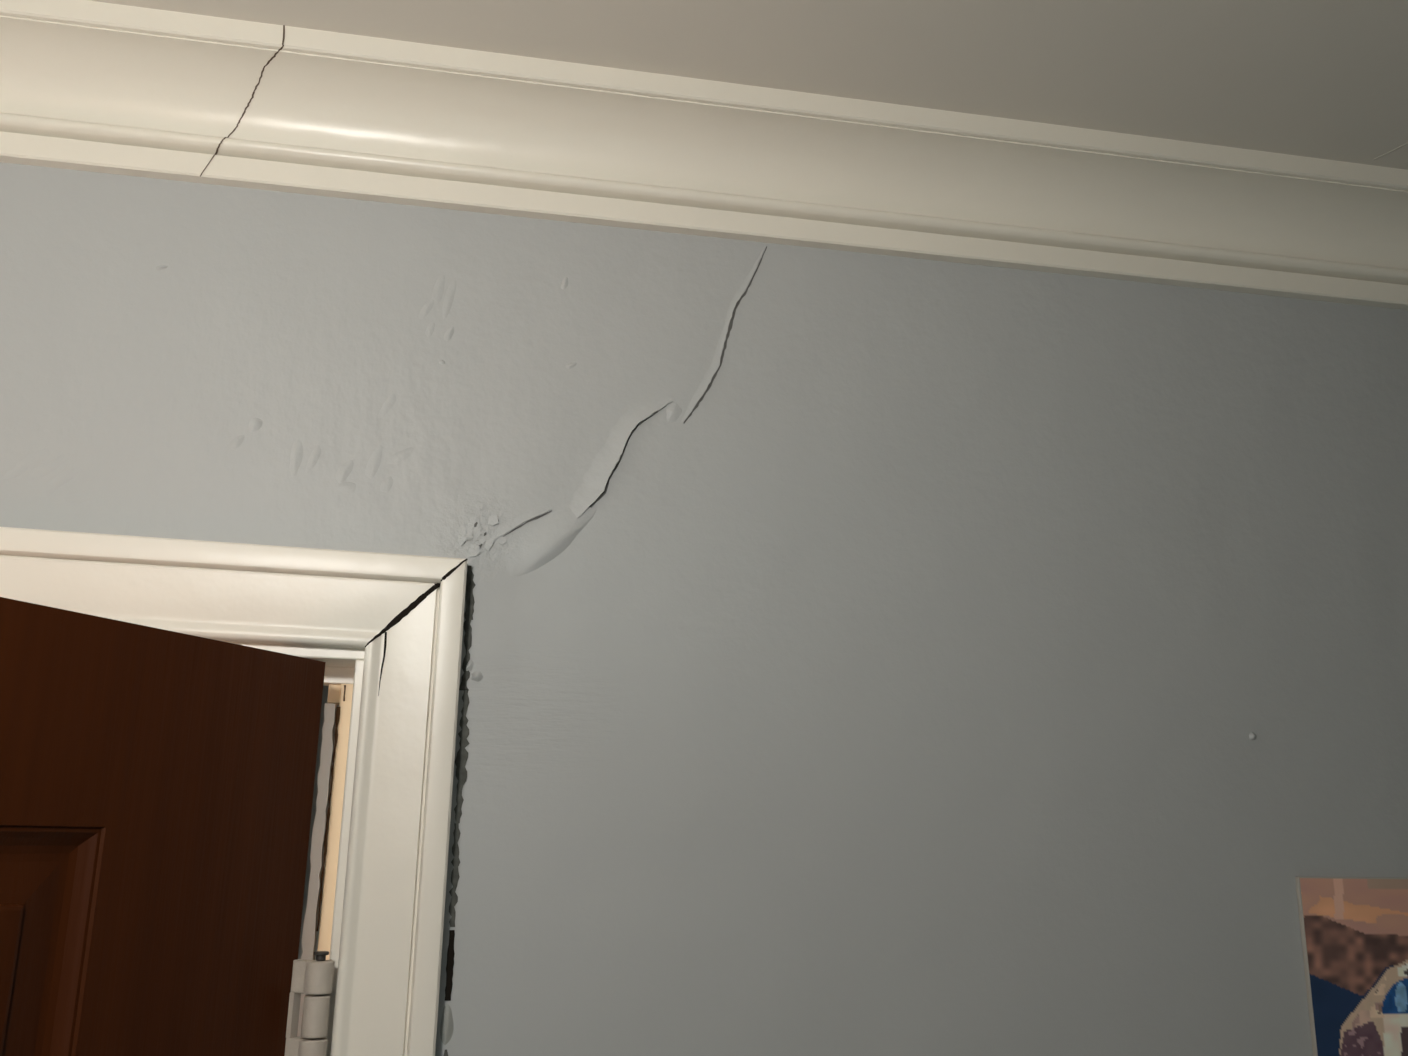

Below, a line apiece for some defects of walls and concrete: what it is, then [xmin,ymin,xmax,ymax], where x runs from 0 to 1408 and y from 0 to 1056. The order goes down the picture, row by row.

crack [200,25,285,177]
crack [681,246,767,423]
peeling [569,397,682,519]